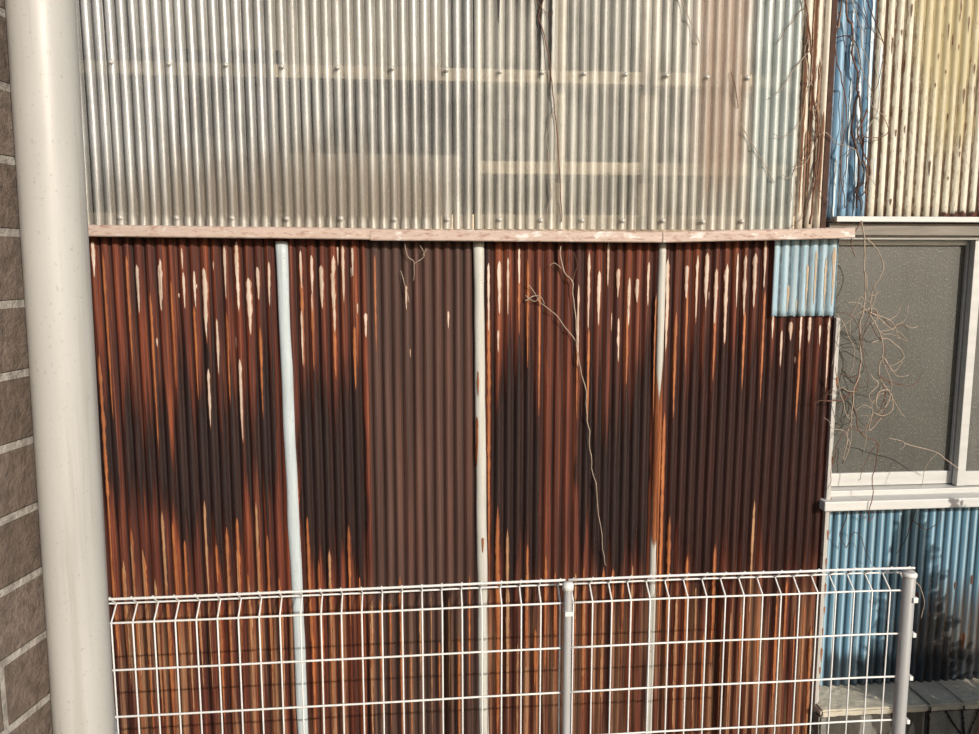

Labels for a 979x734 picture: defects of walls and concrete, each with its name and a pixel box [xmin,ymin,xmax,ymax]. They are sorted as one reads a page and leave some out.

rust [940,209,979,217]
rust [89,237,838,734]
damp [824,650,896,687]
damp [909,578,979,683]